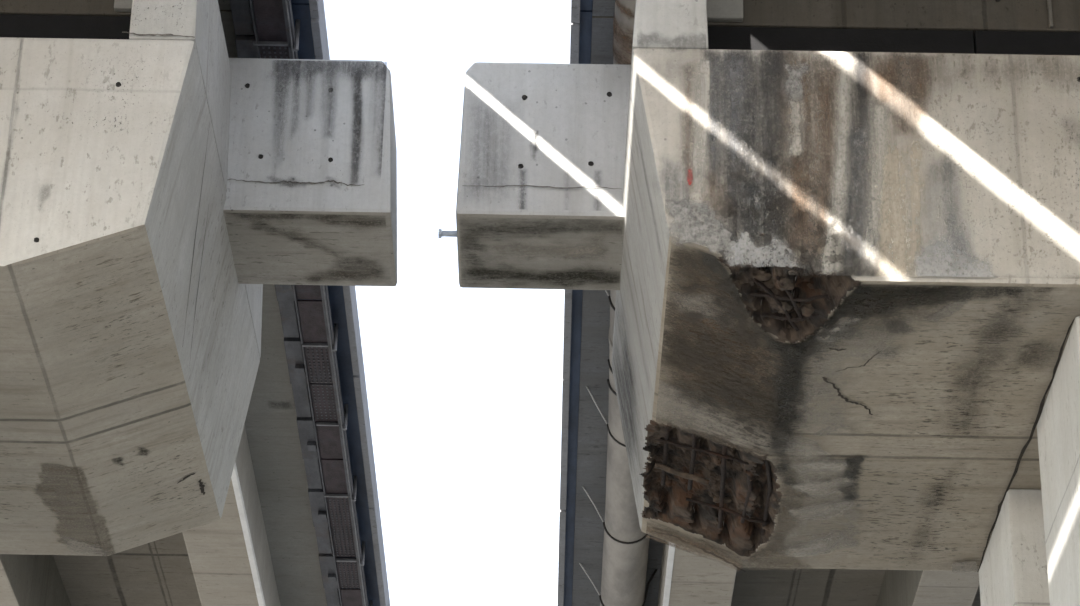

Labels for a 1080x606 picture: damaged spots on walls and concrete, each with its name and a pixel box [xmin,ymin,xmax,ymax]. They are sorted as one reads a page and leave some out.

damp [277,60,387,182]
damp [234,213,300,232]
damp [309,260,380,281]
damp [313,215,385,227]
damp [465,225,620,287]
damp [646,50,1022,570]
crack [822,348,881,415]
damp [36,464,114,556]